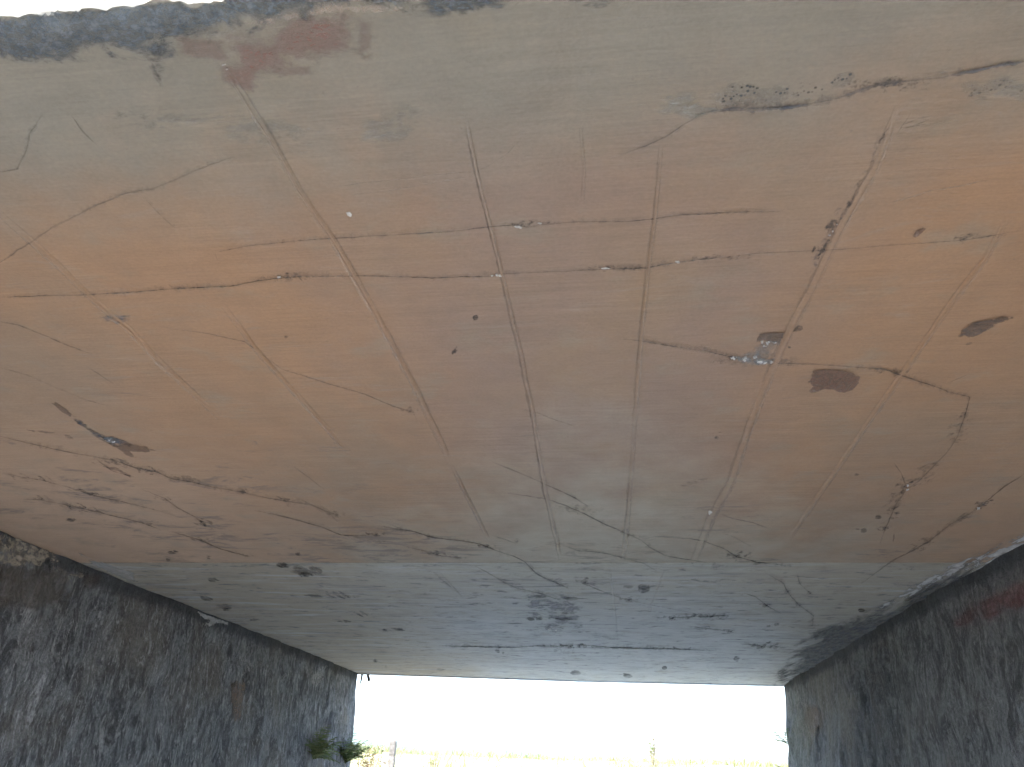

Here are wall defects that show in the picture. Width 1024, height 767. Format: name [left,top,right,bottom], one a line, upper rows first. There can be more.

crack [963,62,1018,74]
crack [778,103,800,111]
damp [959,317,1013,337]
crack [720,354,797,364]
spalling [738,333,784,365]
damp [808,369,860,393]
spalling [75,420,149,456]
crack [514,556,687,650]